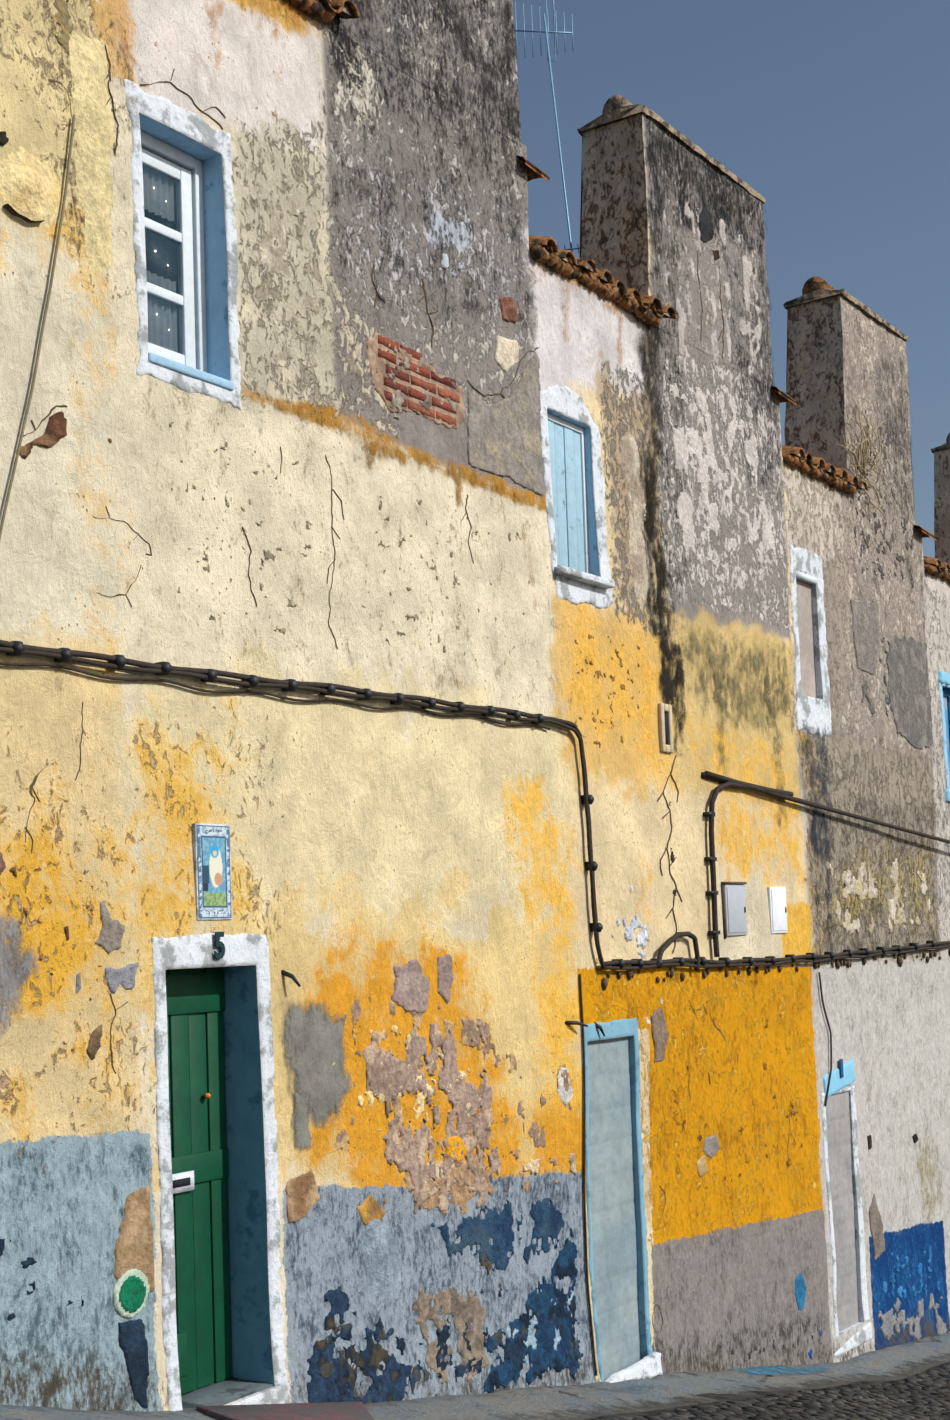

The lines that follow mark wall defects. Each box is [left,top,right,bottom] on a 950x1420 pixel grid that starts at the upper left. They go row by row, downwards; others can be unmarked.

damp [648,124,752,278]
spalling [16,411,67,459]
spalling [366,332,465,429]
crack [93,506,152,607]
crack [325,455,345,649]
damp [639,322,791,767]
crack [657,755,683,953]
damp [802,730,833,927]
peeling [285,1170,320,1224]
peeling [869,1194,947,1341]
peeling [118,1319,149,1409]